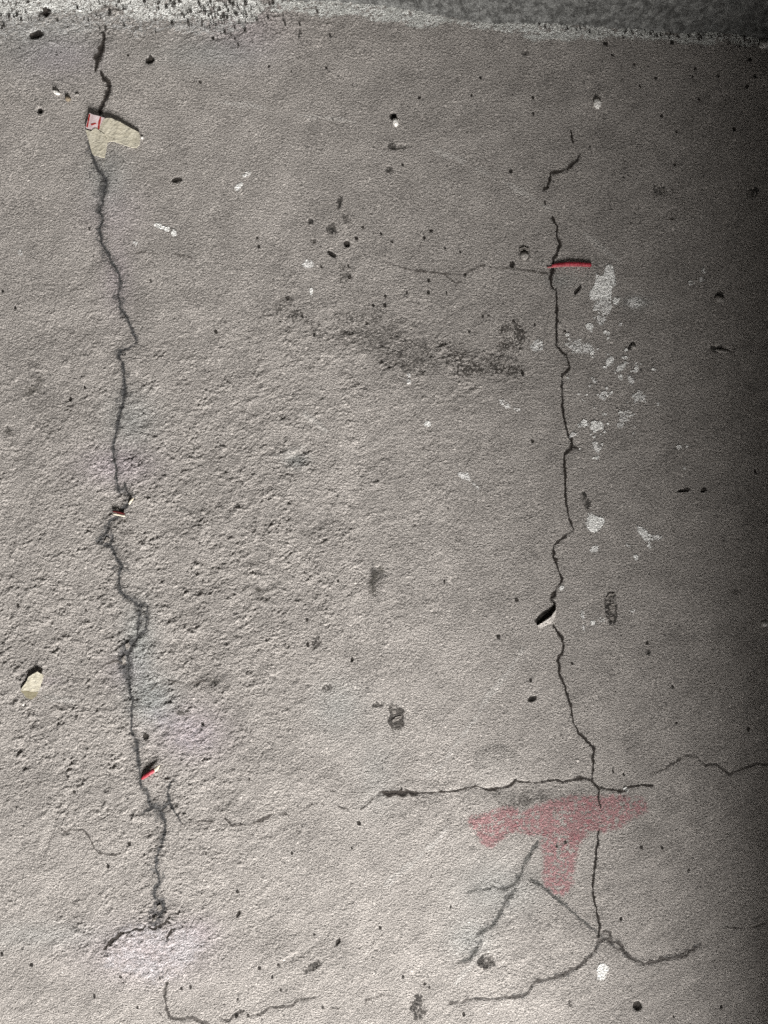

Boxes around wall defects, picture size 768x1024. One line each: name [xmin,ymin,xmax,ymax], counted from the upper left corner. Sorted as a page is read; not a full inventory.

crack [85,32,314,950]
crack [339,131,768,1005]